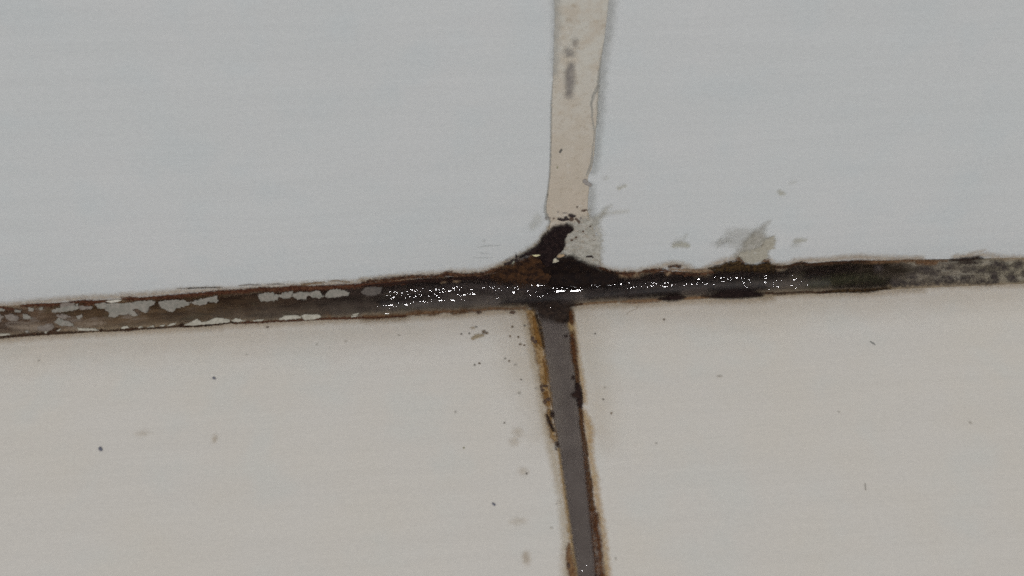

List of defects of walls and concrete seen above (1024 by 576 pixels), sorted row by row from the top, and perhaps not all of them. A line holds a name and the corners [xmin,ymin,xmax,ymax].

peeling [258,287,382,302]
water stain [503,256,1024,322]
peeling [0,296,264,336]